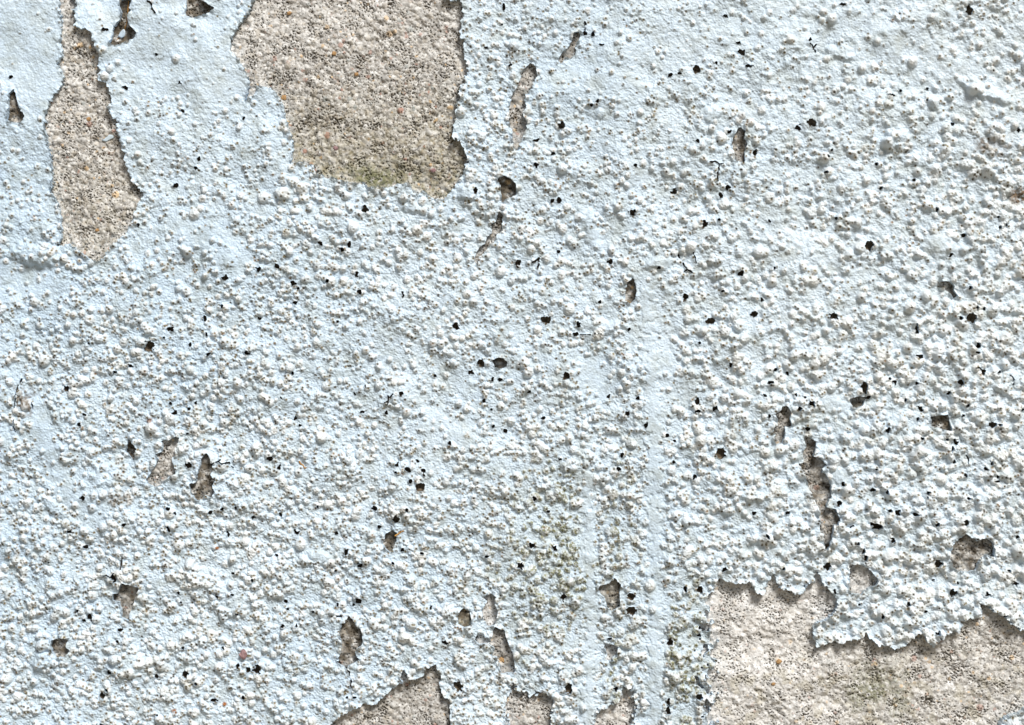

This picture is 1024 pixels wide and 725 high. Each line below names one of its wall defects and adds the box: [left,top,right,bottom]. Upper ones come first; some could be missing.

peeling [7,75,24,123]
peeling [43,0,143,261]
peeling [230,0,469,200]
peeling [509,63,537,151]
peeling [146,437,215,501]
peeling [598,578,638,617]
peeling [683,436,1024,725]
peeling [338,616,363,668]
peeling [330,664,463,725]
peeling [457,594,554,725]